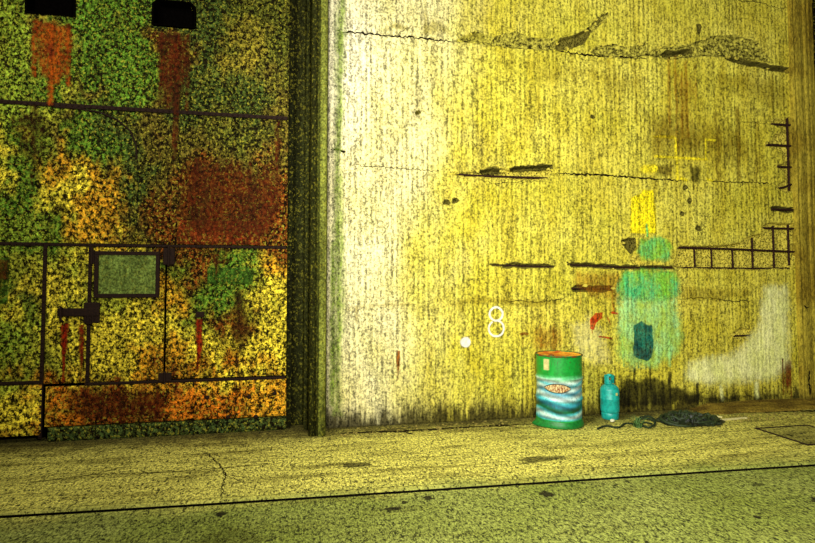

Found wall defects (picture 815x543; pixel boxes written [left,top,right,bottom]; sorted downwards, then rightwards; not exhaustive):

rust [32,20,71,105]
spalling [456,12,608,51]
spalling [590,24,789,73]
spalling [448,163,553,181]
spalling [764,117,793,193]
spalling [566,206,795,271]
rust [61,323,69,382]